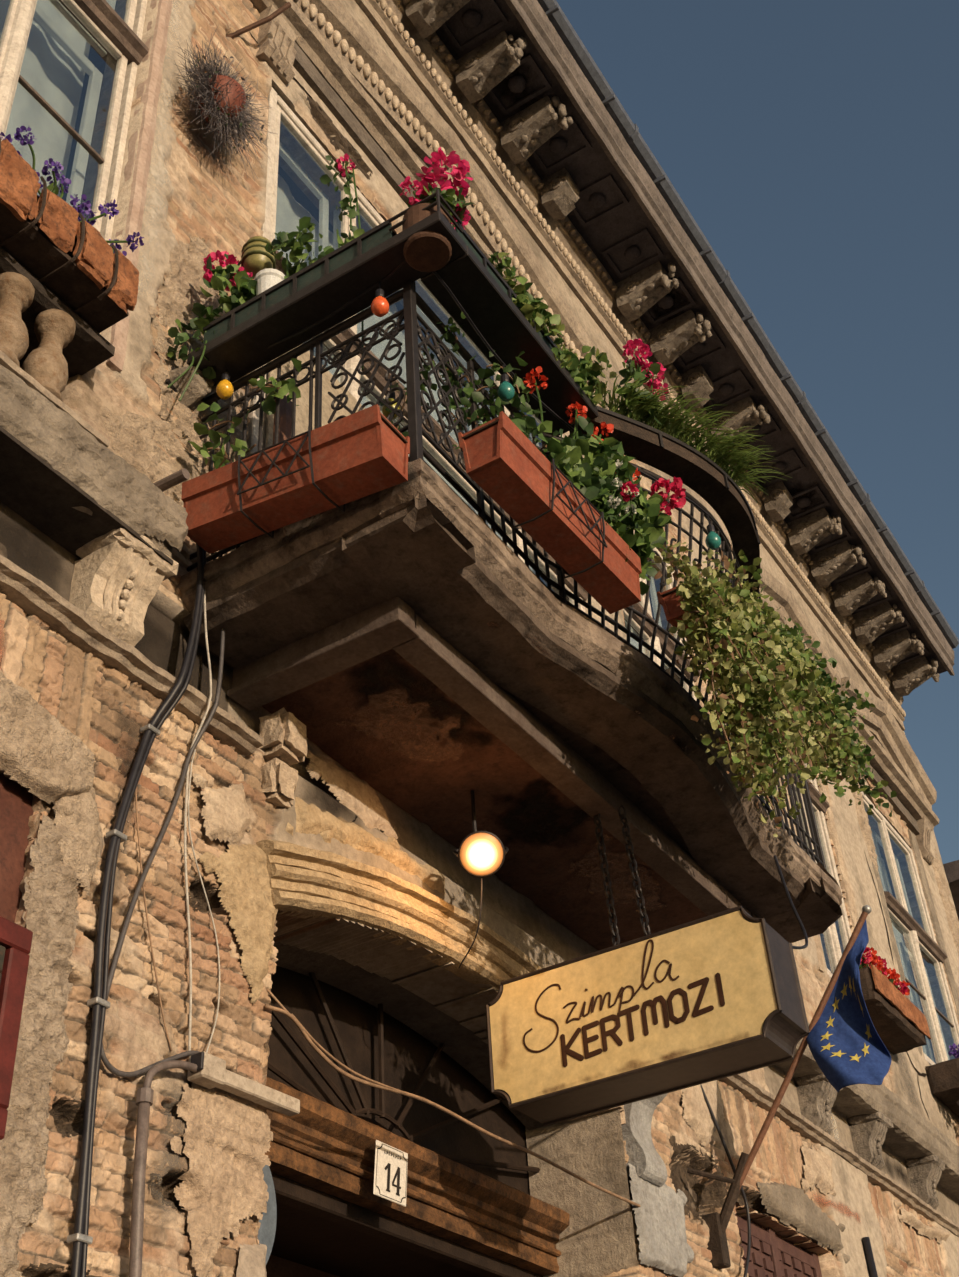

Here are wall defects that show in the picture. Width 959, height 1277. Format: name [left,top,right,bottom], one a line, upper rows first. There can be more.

damp [351,650,490,746]
damp [312,784,352,818]
damp [499,780,593,847]
peeling [188,774,278,1004]
peeling [747,1067,770,1092]
spalling [146,1136,189,1214]
peeling [628,1080,859,1277]
peeling [223,1214,241,1237]